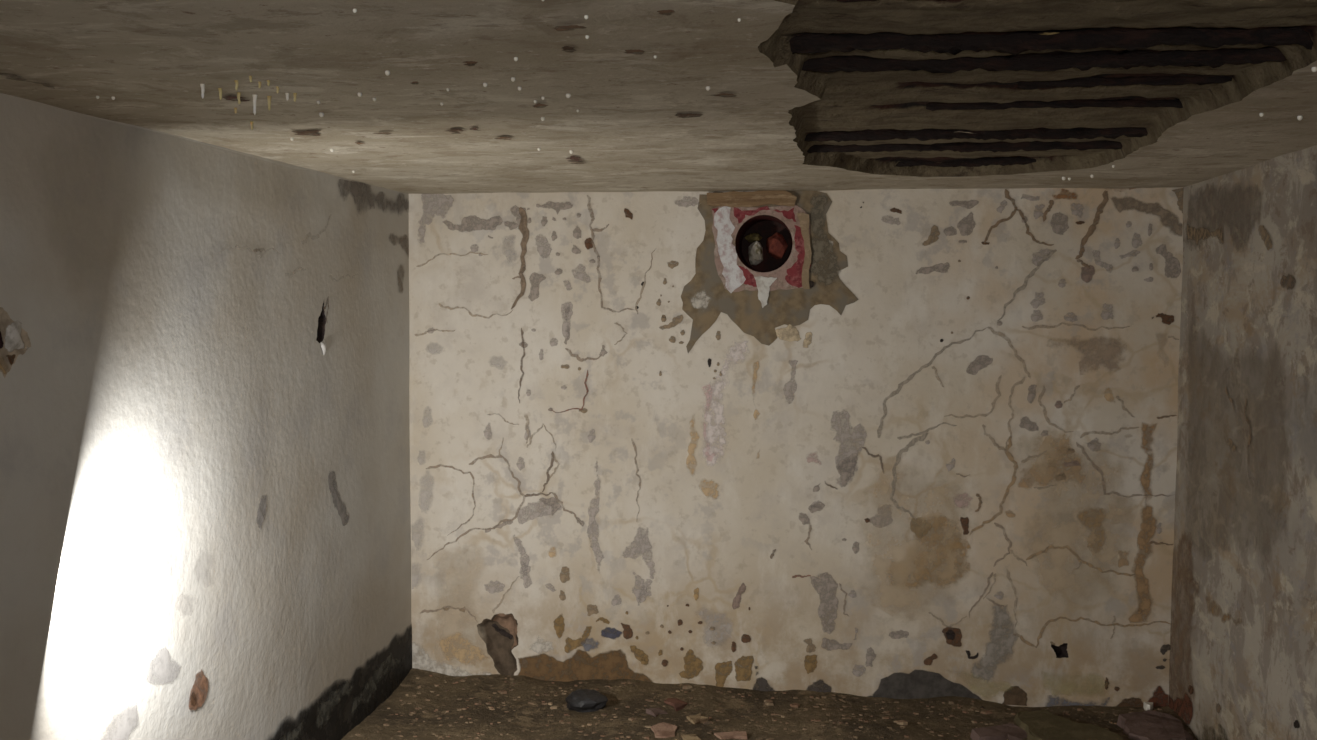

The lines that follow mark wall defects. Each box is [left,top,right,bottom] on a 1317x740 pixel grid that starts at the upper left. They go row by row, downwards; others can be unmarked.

spalling [758,0,1317,177]
spalling [0,307,31,378]
spalling [316,298,329,355]
crack [415,204,655,560]
peeling [675,191,859,404]
crack [862,189,1177,648]
crack [422,581,514,618]
spalling [477,613,519,676]
rust [1118,424,1162,622]
rust [1104,536,1240,724]